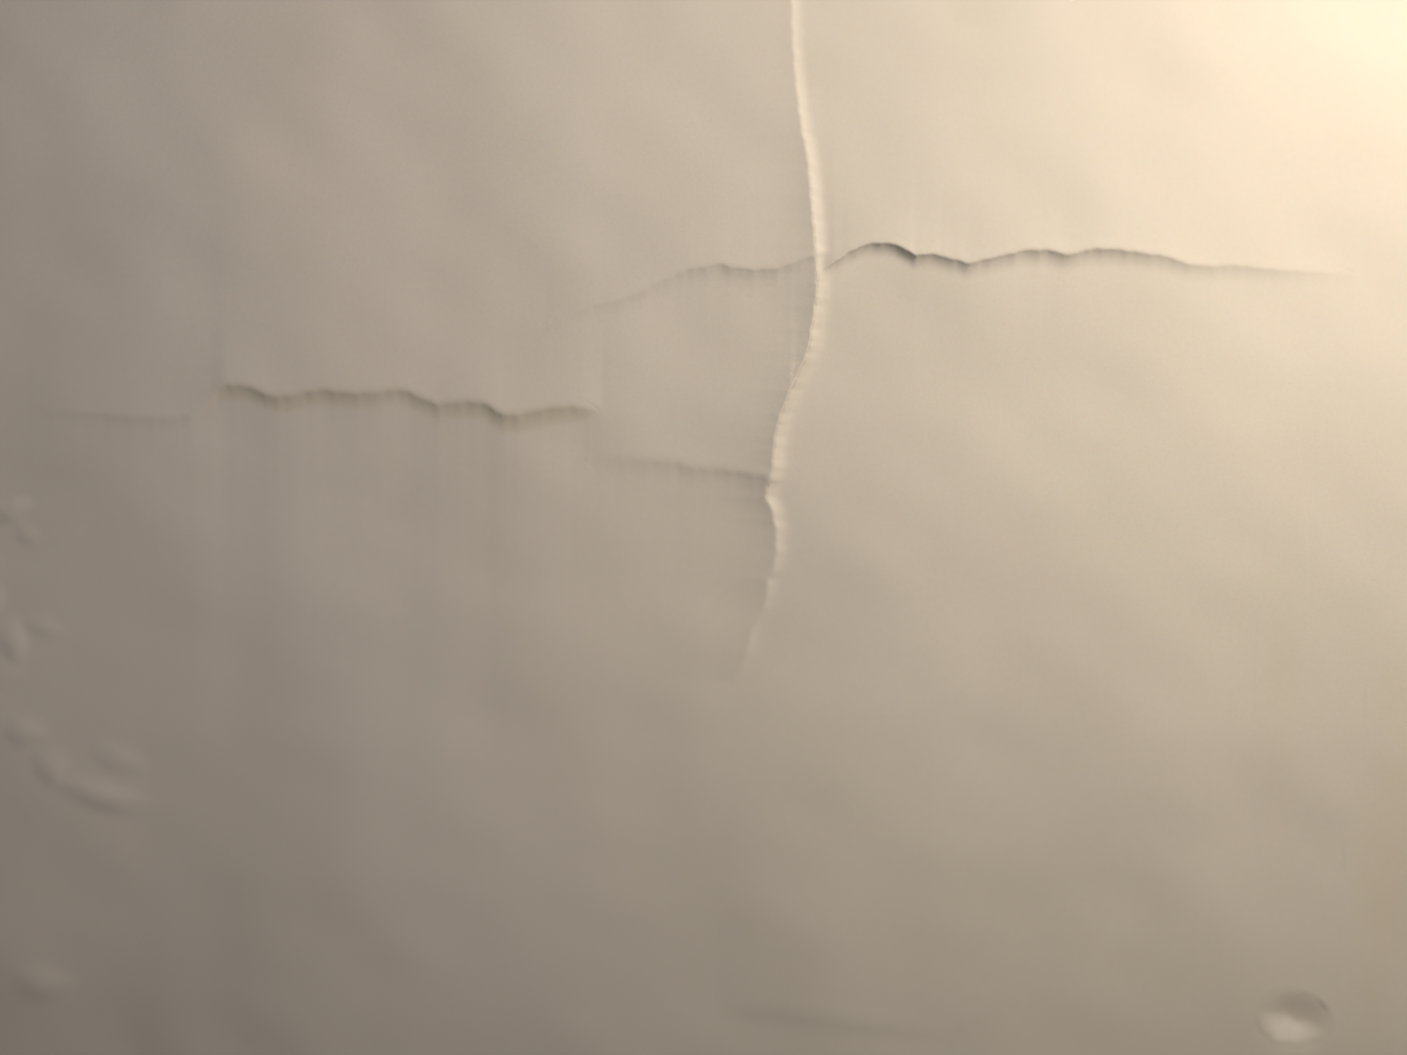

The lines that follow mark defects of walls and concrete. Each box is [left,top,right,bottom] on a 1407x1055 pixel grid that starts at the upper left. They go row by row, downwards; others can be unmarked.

crack [31,0,1358,679]